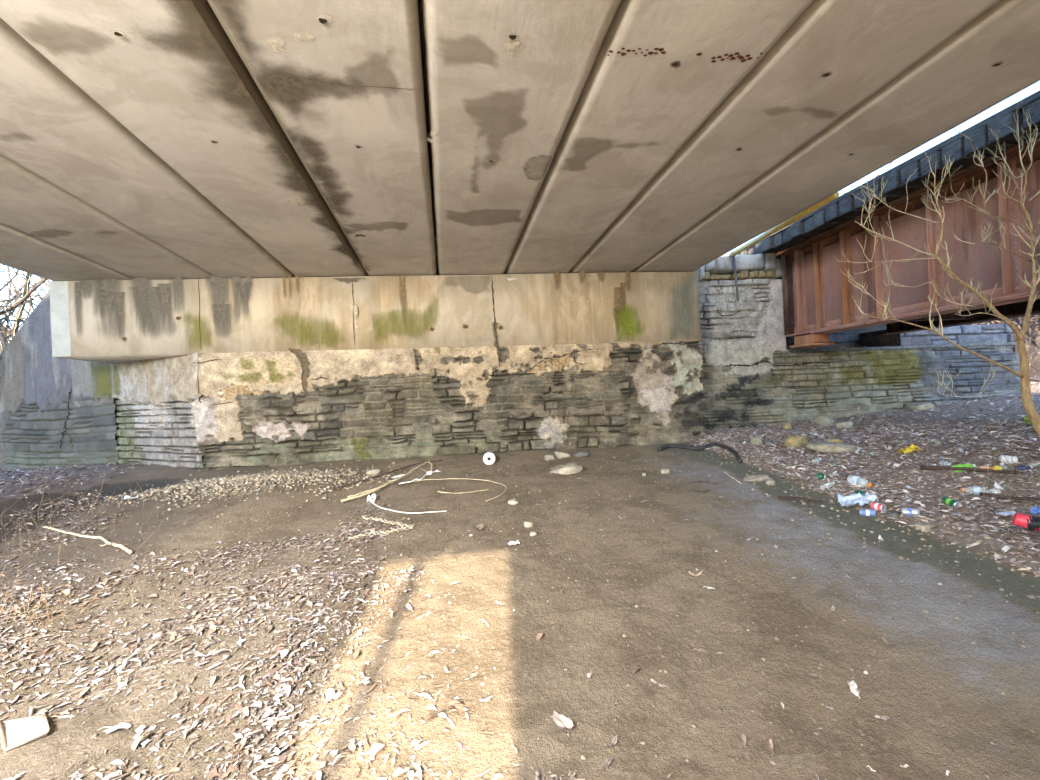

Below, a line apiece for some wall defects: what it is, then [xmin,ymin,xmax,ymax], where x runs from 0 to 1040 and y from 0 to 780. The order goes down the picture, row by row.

corrosion [607,48,666,56]
corrosion [696,52,763,63]
water stain [158,0,361,256]
water stain [75,277,182,334]
water stain [207,275,252,334]
crack [488,282,592,376]
spalling [290,349,310,393]
spalling [527,353,570,375]